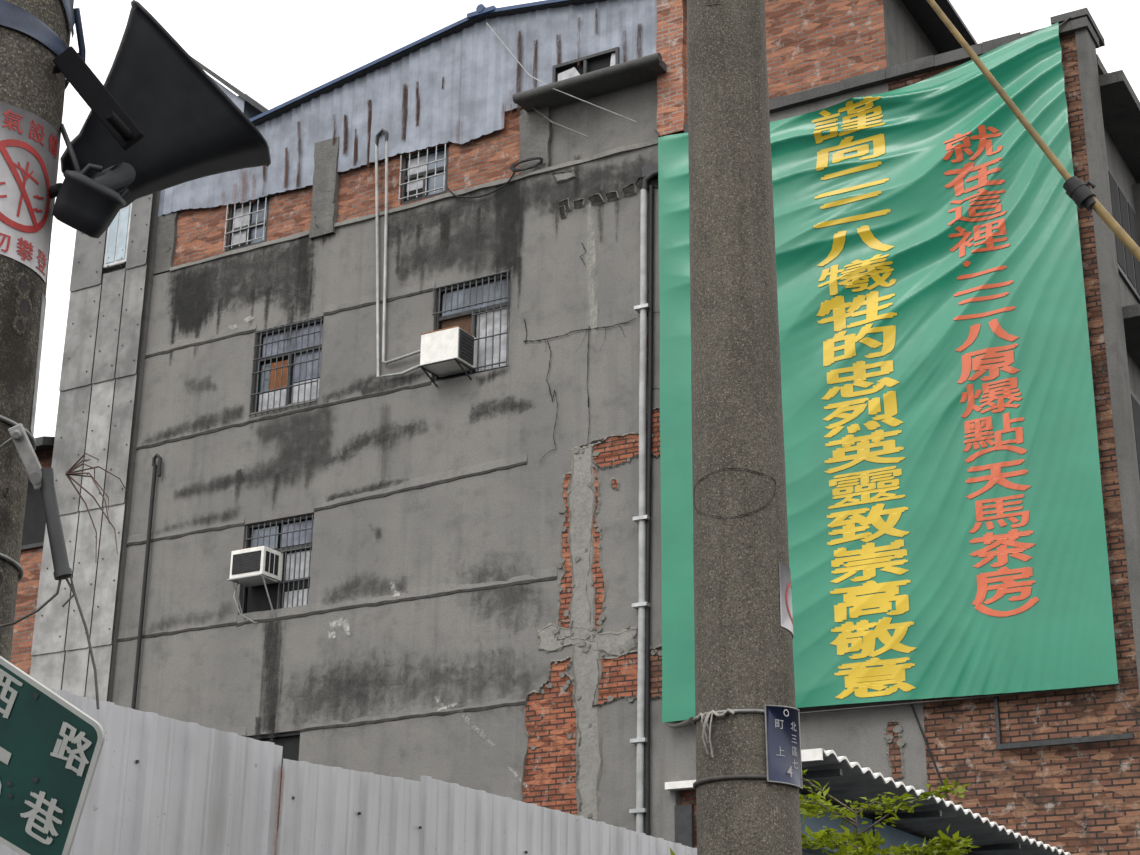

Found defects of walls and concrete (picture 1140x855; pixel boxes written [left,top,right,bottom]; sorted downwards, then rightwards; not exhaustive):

rust [284,121,301,188]
rust [333,100,372,168]
rust [402,82,420,140]
rust [503,31,537,113]
rust [623,24,642,62]
leakage [388,156,645,300]
leakage [170,237,312,356]
leakage [175,375,420,501]
crack [523,311,660,460]
peeling [520,406,662,821]